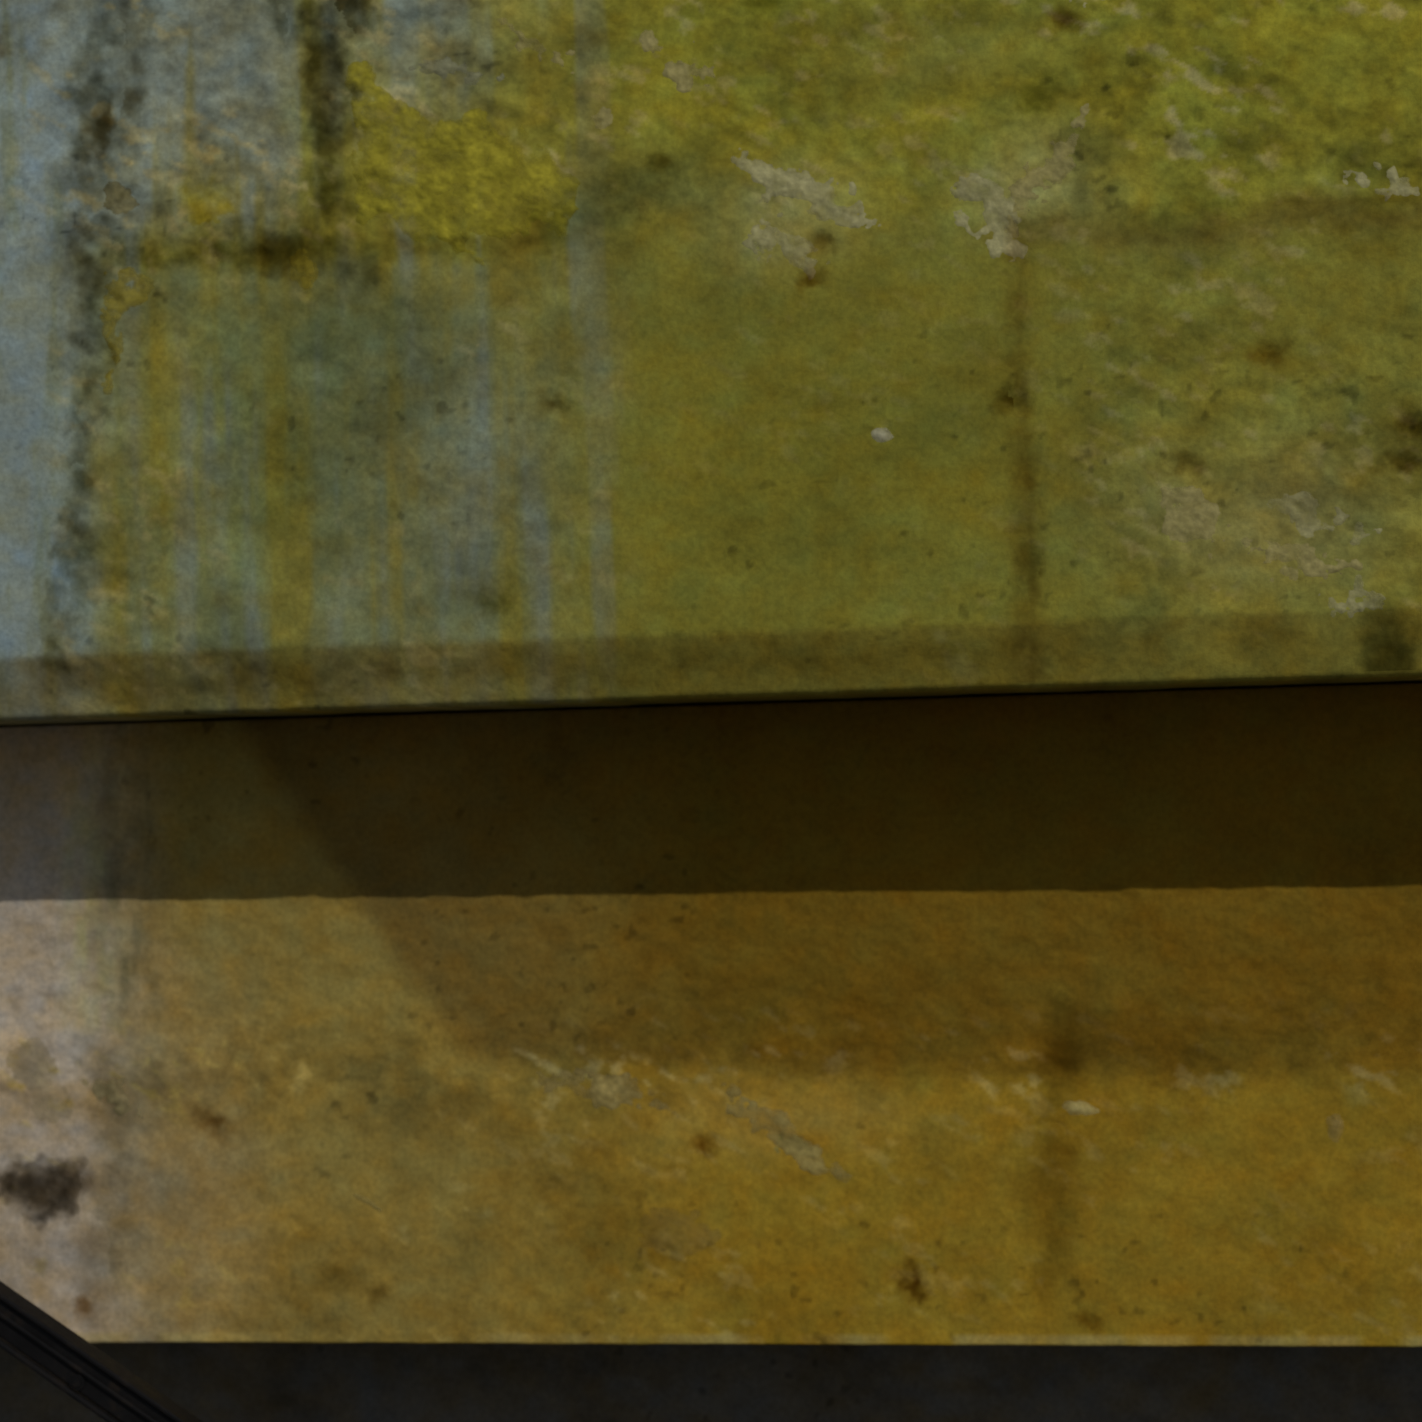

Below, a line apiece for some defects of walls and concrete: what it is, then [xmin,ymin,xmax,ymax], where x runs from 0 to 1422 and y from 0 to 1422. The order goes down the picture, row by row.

damp [308,35,342,71]
damp [2,1168,75,1220]